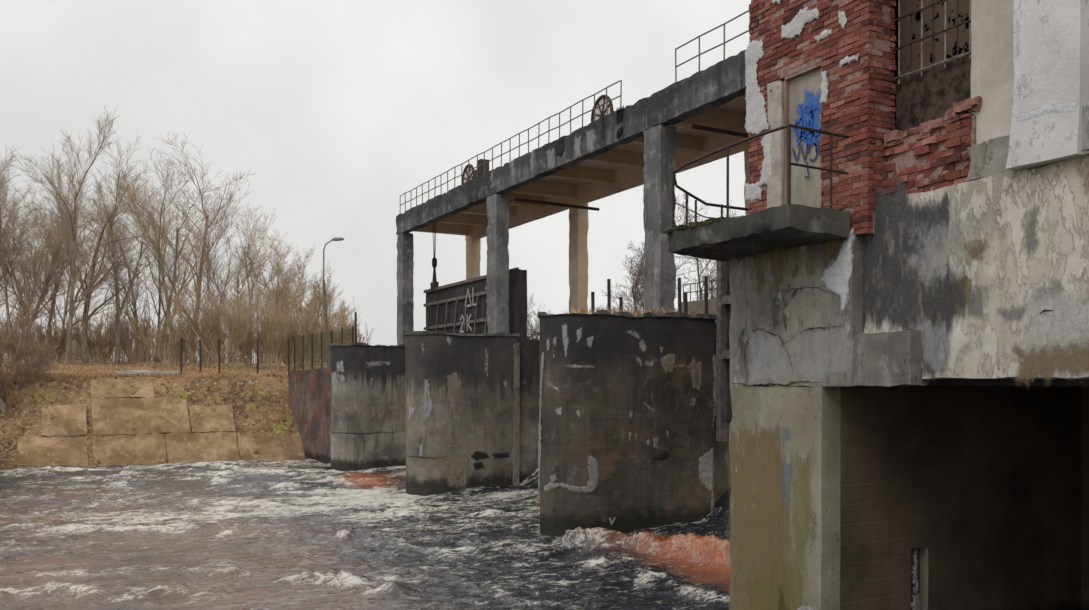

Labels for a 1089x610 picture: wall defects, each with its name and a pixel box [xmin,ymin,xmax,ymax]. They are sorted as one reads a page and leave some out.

peeling [781,7,819,39]
peeling [814,11,847,43]
peeling [819,69,828,103]
peeling [744,39,772,203]
damp [1026,211,1038,250]
damp [862,175,985,378]
peeling [1024,293,1089,349]
crack [732,320,844,386]
damp [727,429,792,610]
spalling [911,551,921,610]